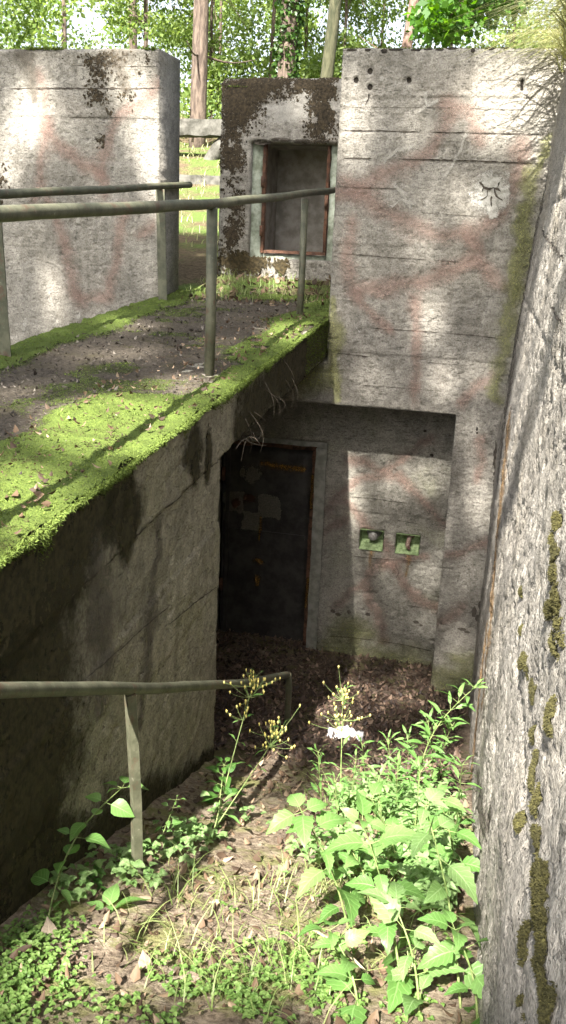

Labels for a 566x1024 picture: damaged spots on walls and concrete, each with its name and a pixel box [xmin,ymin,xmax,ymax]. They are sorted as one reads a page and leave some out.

leakage [184,423,212,485]